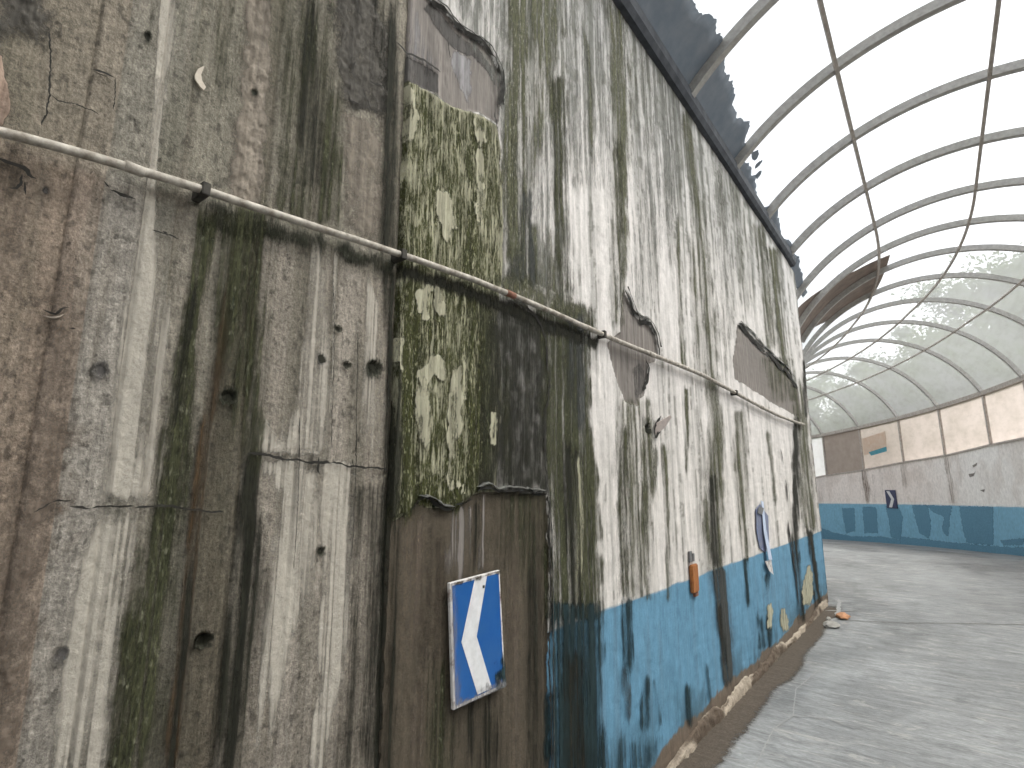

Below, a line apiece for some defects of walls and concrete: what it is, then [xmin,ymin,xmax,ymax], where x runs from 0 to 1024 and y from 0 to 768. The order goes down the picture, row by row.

crack [41,30,116,125]
damp [54,0,189,768]
crack [35,499,223,513]
damp [175,289,197,418]
peeling [0,0,549,768]
crack [249,286,387,568]
damp [205,0,788,768]
peeling [607,292,657,406]
damp [676,361,837,768]
peeling [733,325,801,419]
flaking render [666,565,828,768]